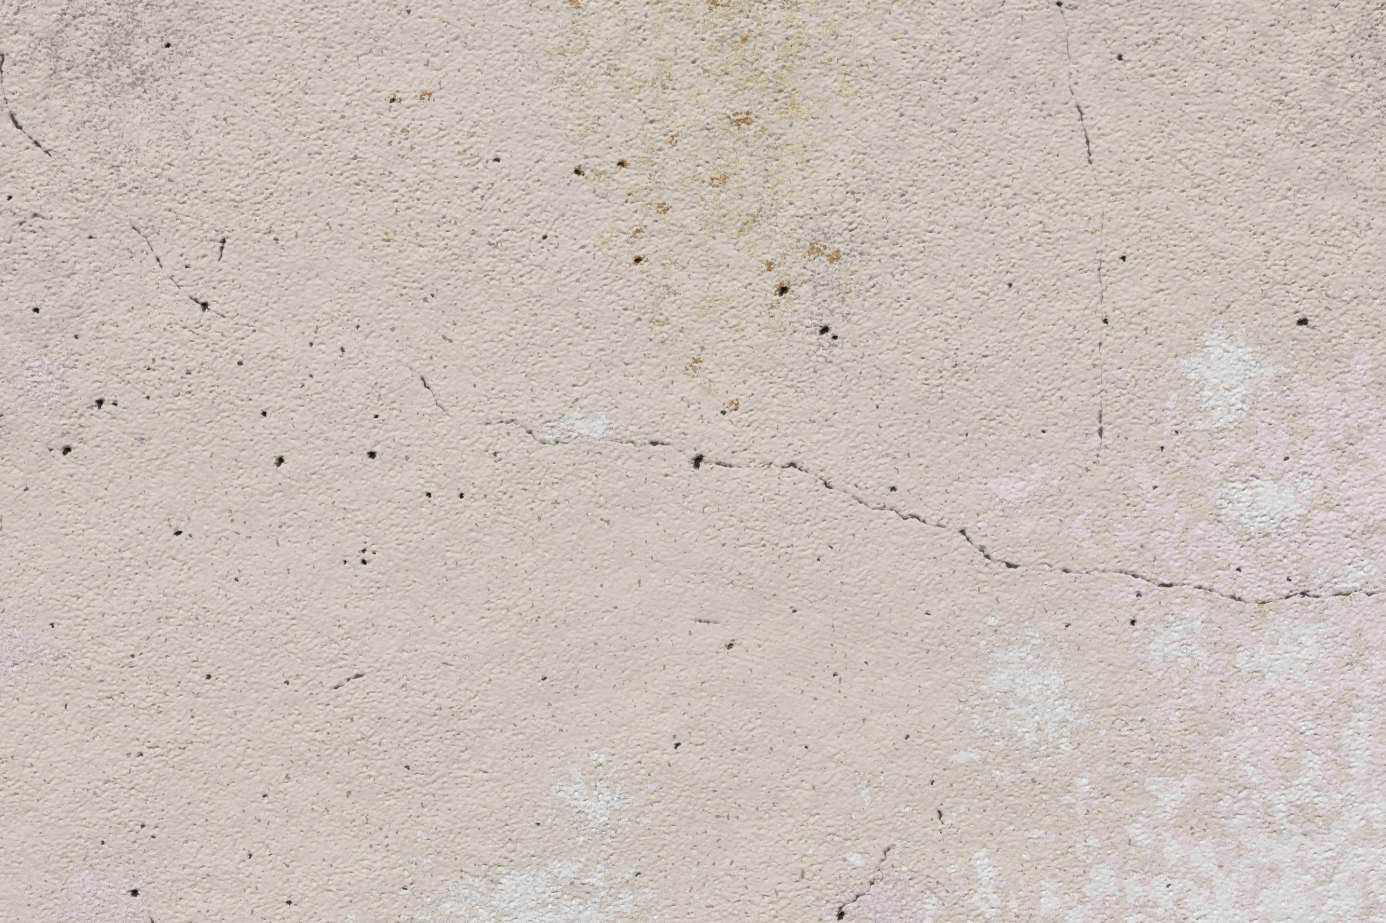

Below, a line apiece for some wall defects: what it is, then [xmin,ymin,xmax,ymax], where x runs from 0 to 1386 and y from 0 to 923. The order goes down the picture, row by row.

crack [0,54,51,157]
crack [1071,91,1092,164]
crack [133,227,225,318]
crack [620,442,1375,604]